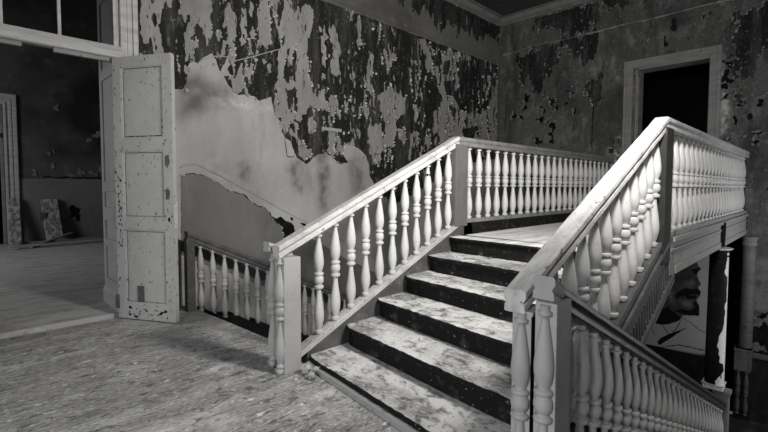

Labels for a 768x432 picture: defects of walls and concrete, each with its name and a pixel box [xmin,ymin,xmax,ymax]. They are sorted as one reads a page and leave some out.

peeling [138,0,500,184]
peeling [510,0,647,147]
peeling [720,0,768,147]
spalling [272,217,306,238]
peeling [382,154,447,204]
peeling [744,157,759,237]
spalling [752,310,768,355]